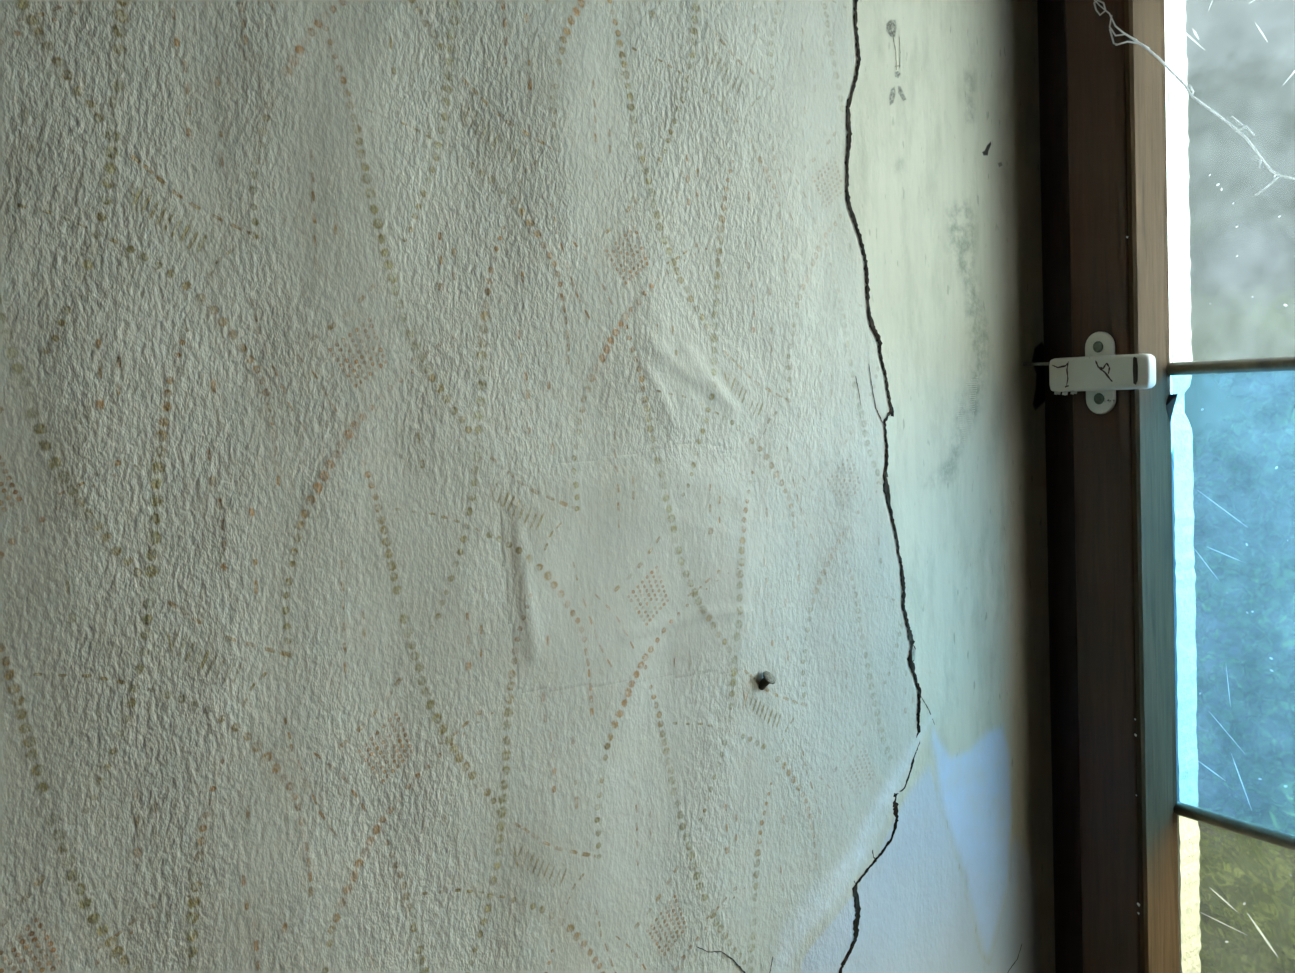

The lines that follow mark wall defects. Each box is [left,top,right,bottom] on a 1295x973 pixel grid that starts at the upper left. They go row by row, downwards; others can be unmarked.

crack [839,0,935,973]